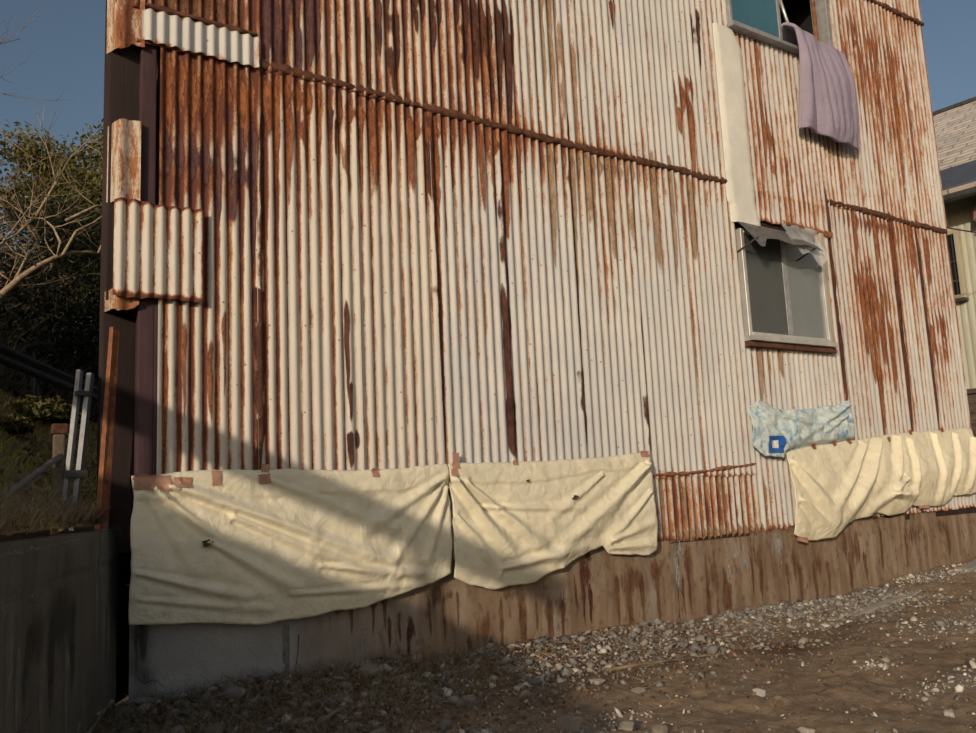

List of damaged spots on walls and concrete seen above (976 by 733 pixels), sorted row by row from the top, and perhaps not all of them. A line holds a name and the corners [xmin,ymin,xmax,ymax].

rust [154,0,400,470]
rust [411,0,442,48]
rust [406,115,454,457]
rust [454,0,522,457]
rust [531,0,678,451]
rust [674,9,701,259]
rust [753,40,806,229]
rust [840,12,921,216]
rust [824,188,949,435]
rust [467,552,593,651]
rust [615,563,661,623]
rust [659,470,768,615]